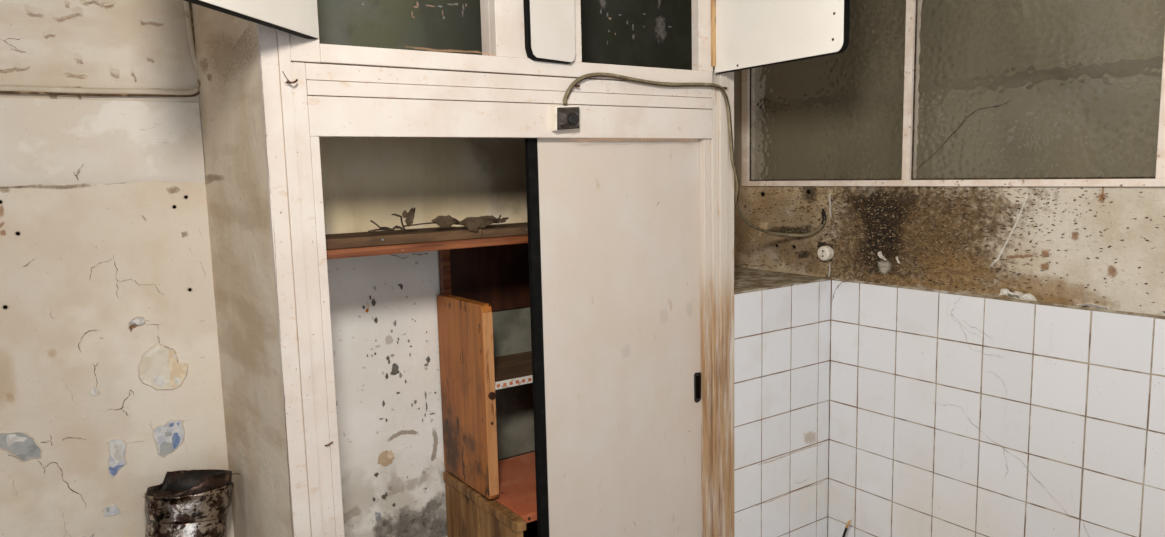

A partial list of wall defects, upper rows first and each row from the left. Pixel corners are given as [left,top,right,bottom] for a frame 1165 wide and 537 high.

damp [744,186,1165,305]
crack [66,330,160,458]
flaking render [138,342,188,391]
peeling [367,320,412,394]
peeling [0,430,43,463]
crack [9,435,86,535]
peeling [107,437,127,478]
peeling [152,418,185,458]
flaking render [374,391,436,477]